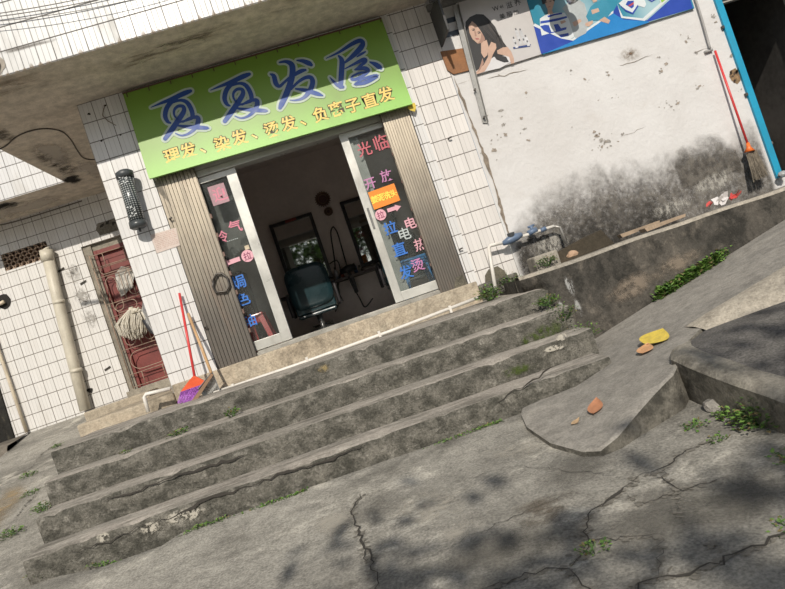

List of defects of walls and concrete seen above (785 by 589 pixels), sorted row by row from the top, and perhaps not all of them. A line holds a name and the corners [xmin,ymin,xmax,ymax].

damp [40,156,81,183]
damp [517,141,774,275]
damp [618,276,646,299]
crack [497,366,554,403]
spalling [141,509,205,533]
crack [350,495,379,589]
crack [415,440,720,589]
crack [637,532,785,589]